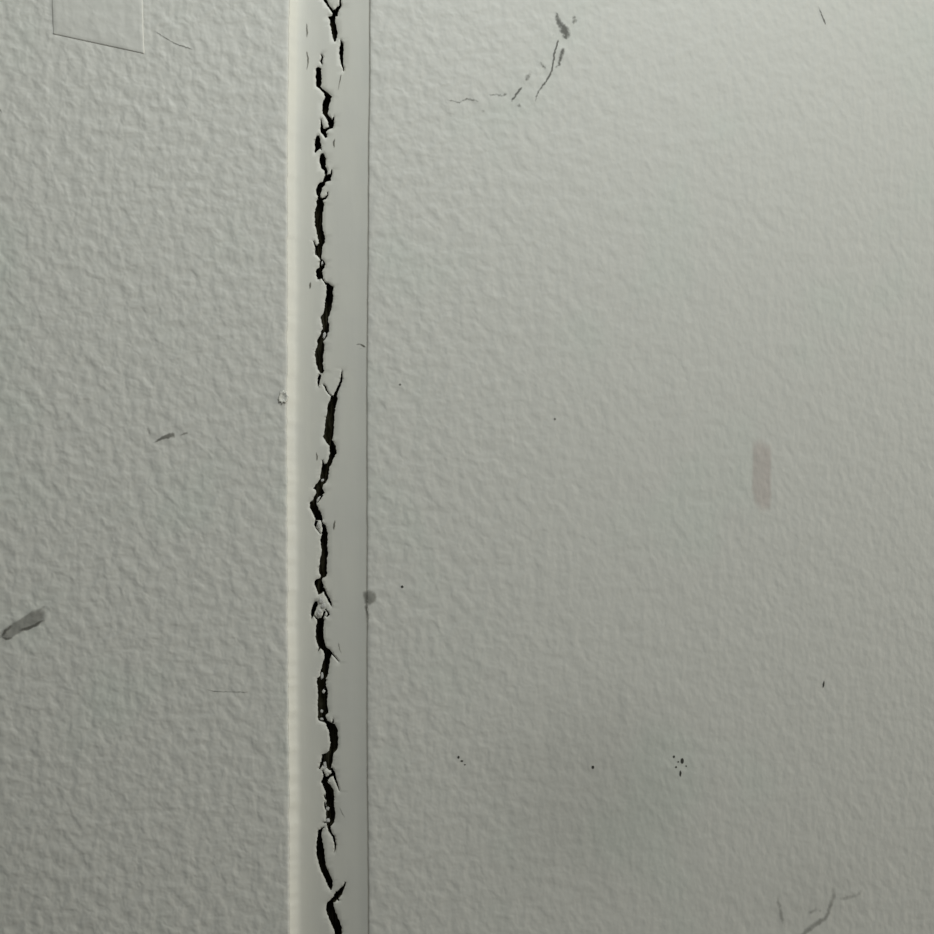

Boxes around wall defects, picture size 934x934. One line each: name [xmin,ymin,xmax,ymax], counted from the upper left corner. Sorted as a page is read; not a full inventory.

crack [306,0,346,934]
crack [512,16,568,100]